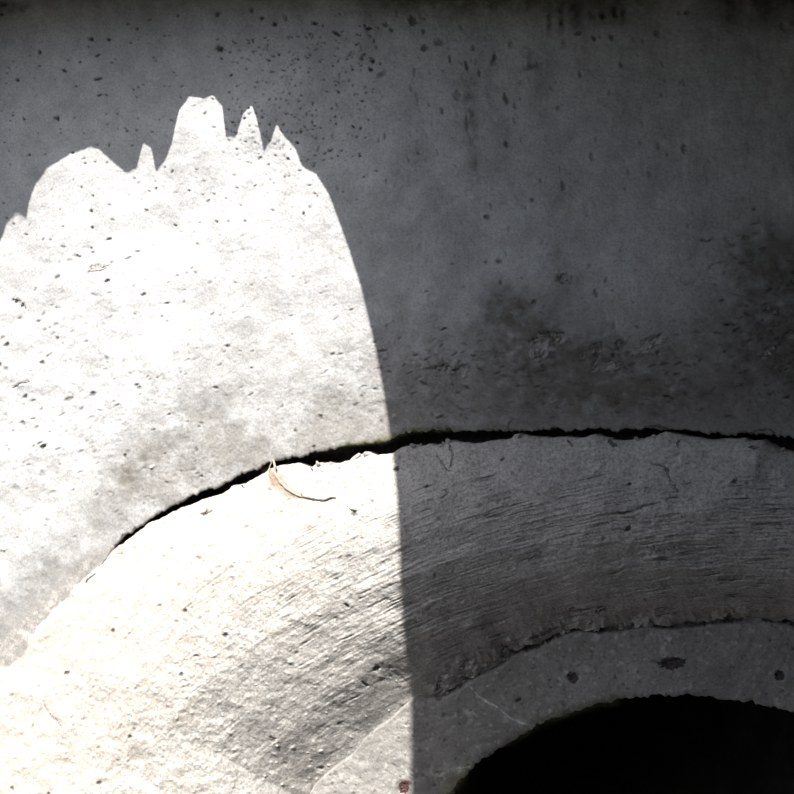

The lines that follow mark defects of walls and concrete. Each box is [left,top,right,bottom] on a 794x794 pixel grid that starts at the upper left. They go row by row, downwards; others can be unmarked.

crack [121,419,794,544]
crack [436,606,794,697]
rust [399,781,409,794]